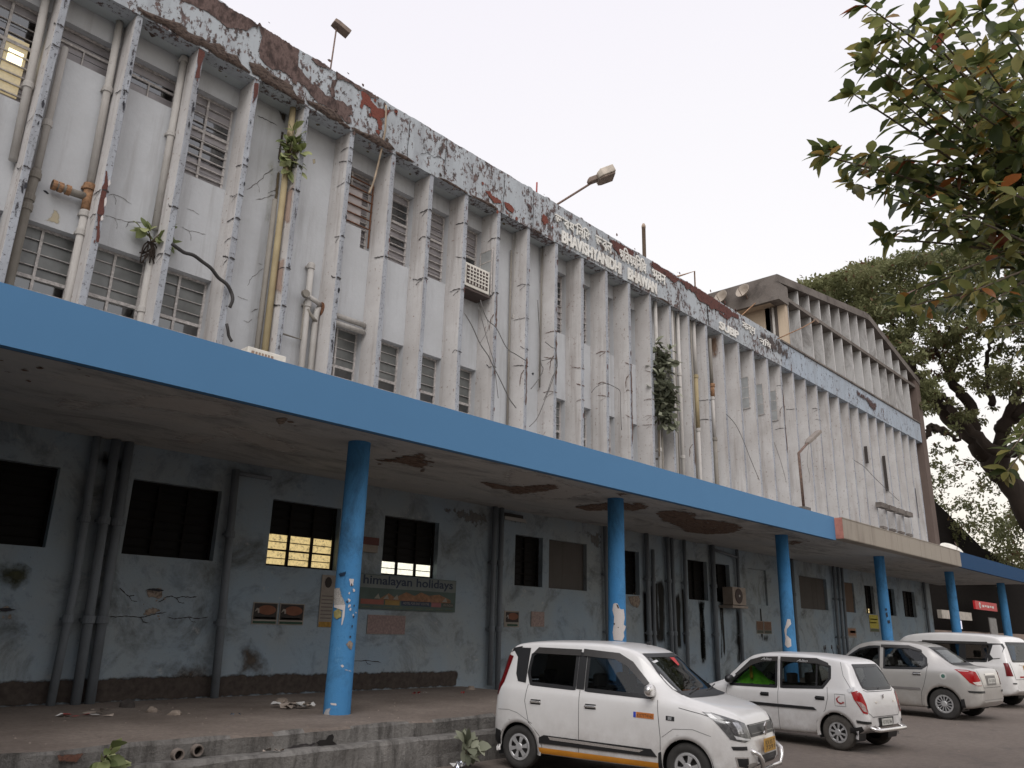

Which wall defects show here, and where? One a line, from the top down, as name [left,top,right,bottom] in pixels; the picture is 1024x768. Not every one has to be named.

peeling [138,0,418,167]
peeling [438,173,554,236]
peeling [611,233,635,260]
peeling [650,261,744,321]
spalling [375,451,434,472]
spalling [480,482,568,496]
spalling [617,493,745,534]
crack [110,588,207,623]
peeling [346,579,355,650]
peeling [613,593,640,641]